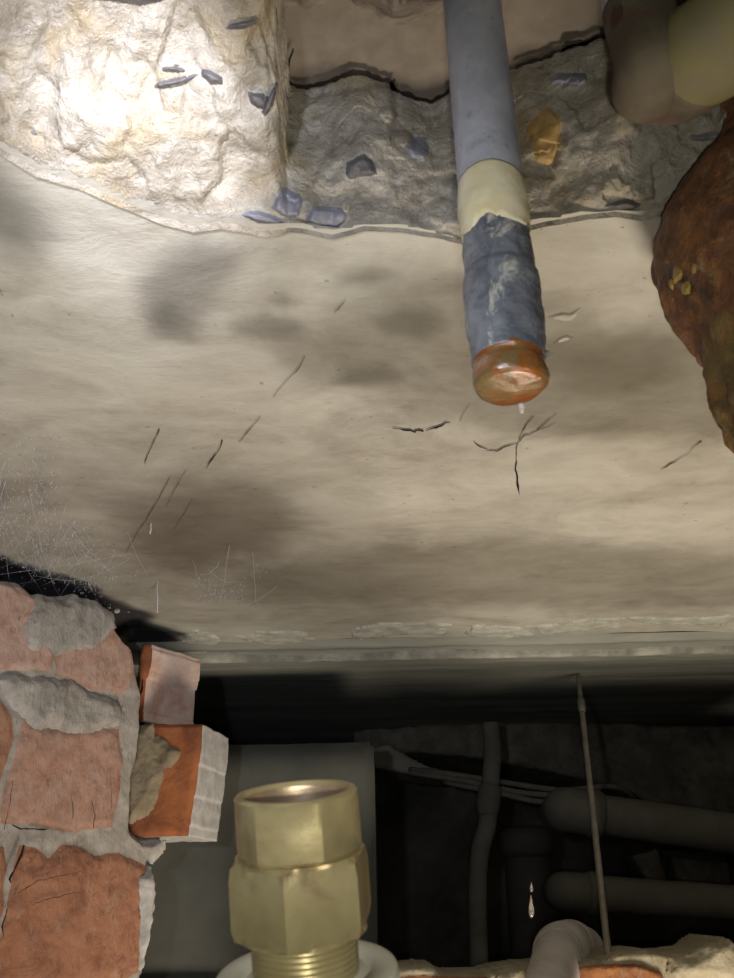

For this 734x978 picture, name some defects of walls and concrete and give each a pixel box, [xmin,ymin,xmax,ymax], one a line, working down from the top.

crack [288,49,450,104]
crack [515,34,606,70]
spalling [0,0,462,244]
spalling [510,39,726,230]
crack [393,405,469,433]
crack [474,416,555,495]